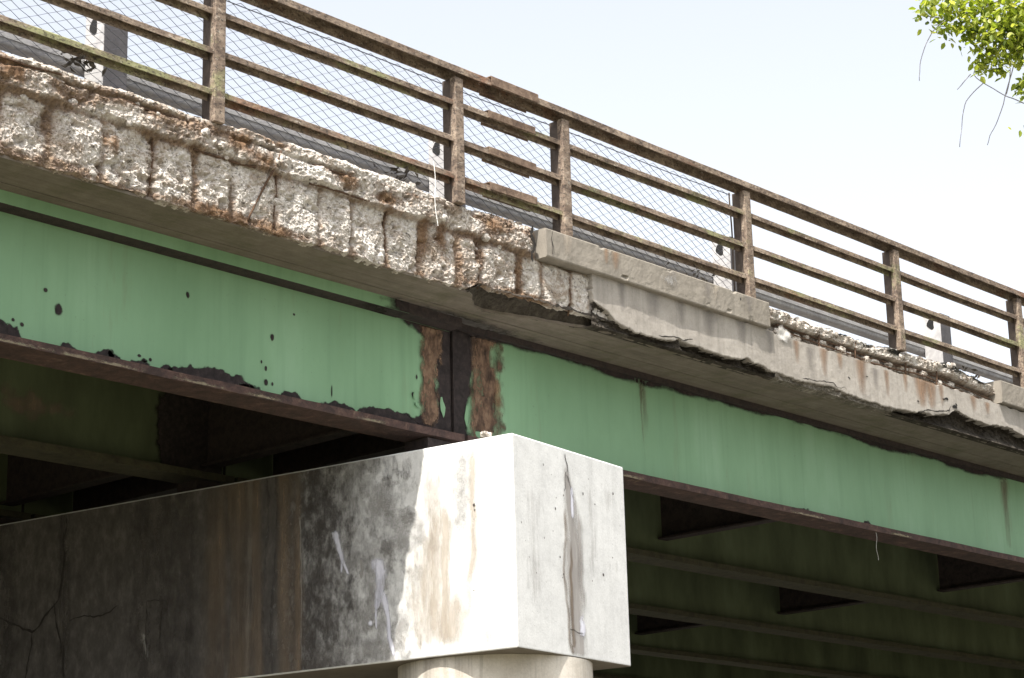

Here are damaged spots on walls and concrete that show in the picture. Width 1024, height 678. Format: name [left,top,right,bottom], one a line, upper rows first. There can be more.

spalling [0,50,1024,456]
corrosion [323,299,774,438]
corrosion [848,435,1007,502]
crack [0,519,116,678]
leakage [0,460,436,678]
leakage [564,472,585,655]